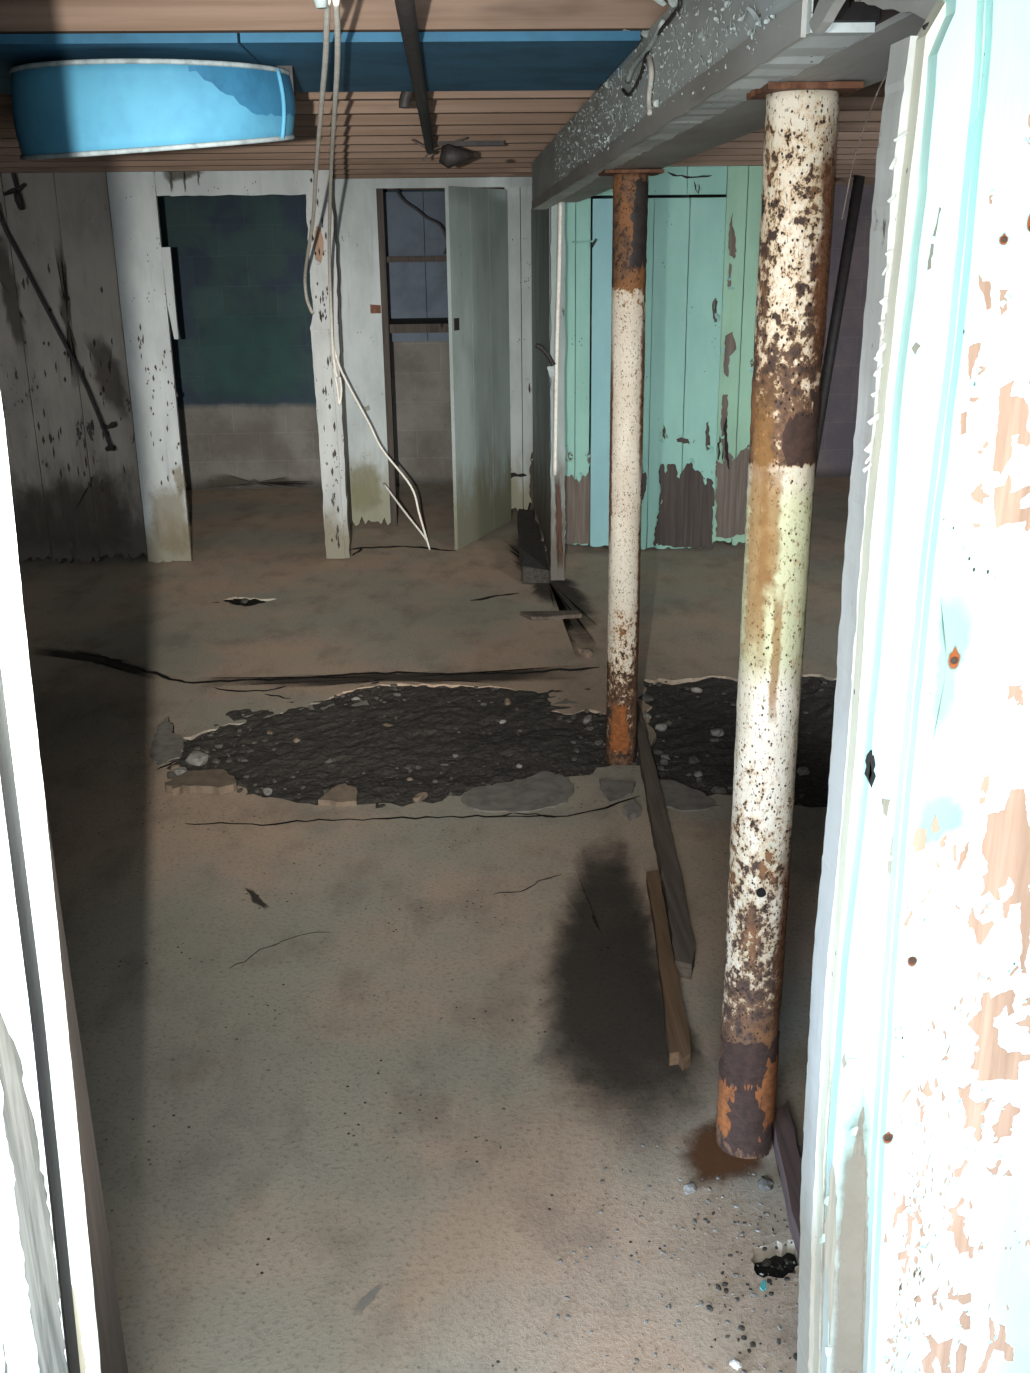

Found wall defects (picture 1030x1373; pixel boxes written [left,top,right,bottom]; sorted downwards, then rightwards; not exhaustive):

leakage [0,247,25,342]
leakage [57,260,124,408]
corrosion [629,176,649,269]
corrosion [812,155,836,345]
leakage [24,482,121,545]
peeling [641,394,750,549]
corrosion [746,389,822,706]
peeling [958,341,1030,533]
crack [81,653,599,699]
peeling [881,770,1030,1259]
corrosion [684,1031,780,1181]
peeling [913,1285,1015,1373]